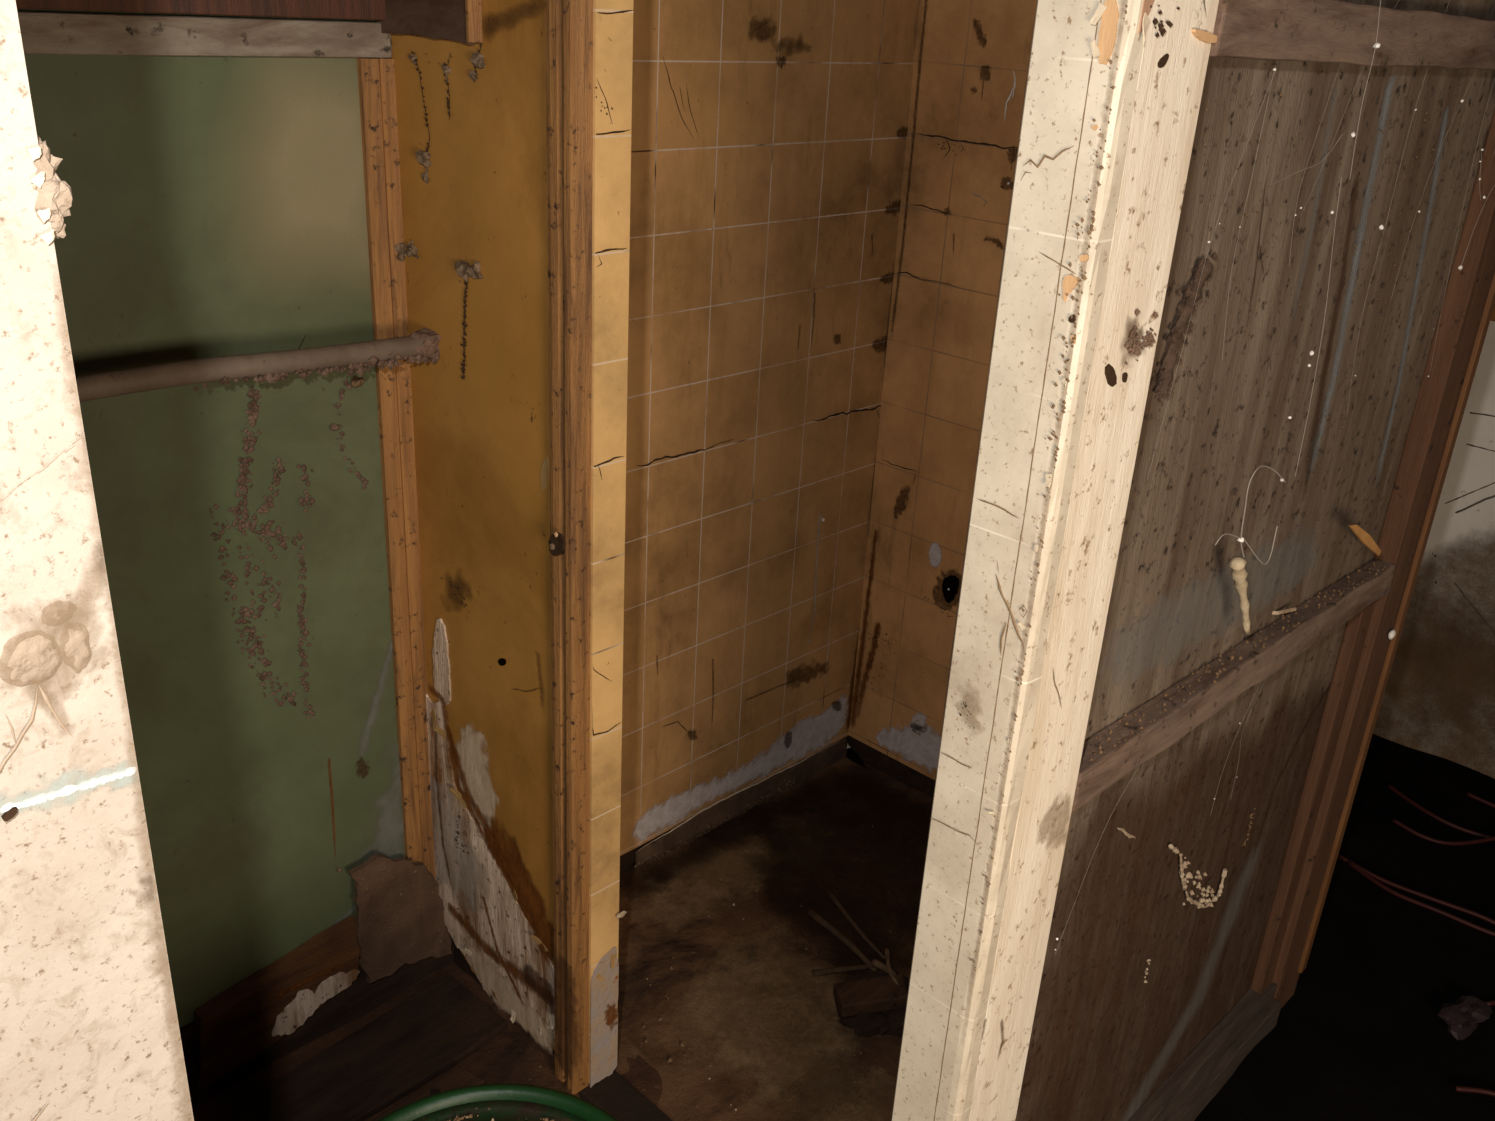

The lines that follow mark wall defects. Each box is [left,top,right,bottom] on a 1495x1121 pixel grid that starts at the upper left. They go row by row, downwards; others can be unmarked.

peeling [1157,54,1169,68]
leakage [873,0,927,359]
crack [915,134,1018,157]
crack [812,405,916,483]
peeling [981,106,1112,904]
leakage [209,504,315,719]
leakage [634,458,877,841]
corrosion [858,623,896,713]
leakage [875,712,941,773]
peeling [426,618,555,1052]
corrosion [482,815,554,961]
peeling [272,964,360,1036]